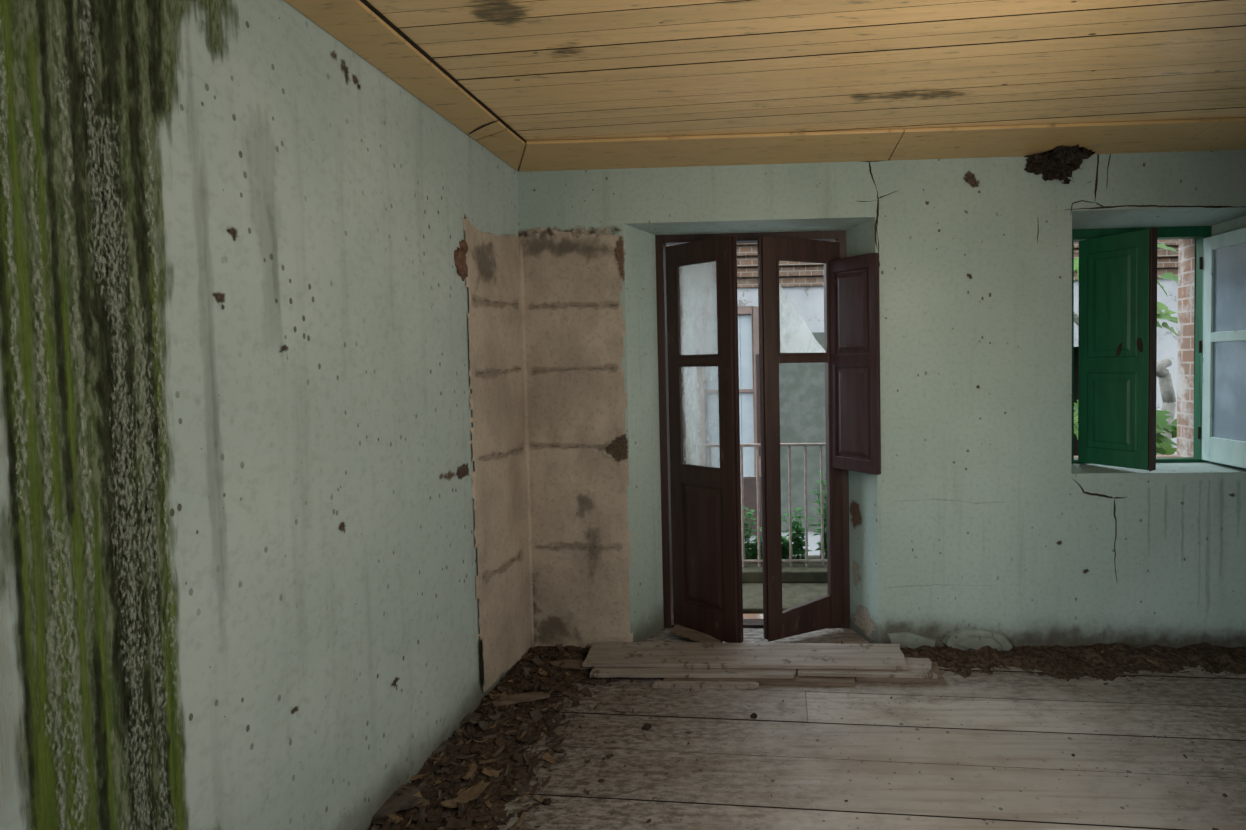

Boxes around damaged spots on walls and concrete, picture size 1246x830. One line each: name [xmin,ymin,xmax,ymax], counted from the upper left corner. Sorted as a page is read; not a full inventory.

crack [858,159,896,267]
damp [0,0,184,830]
crack [1073,479,1125,579]